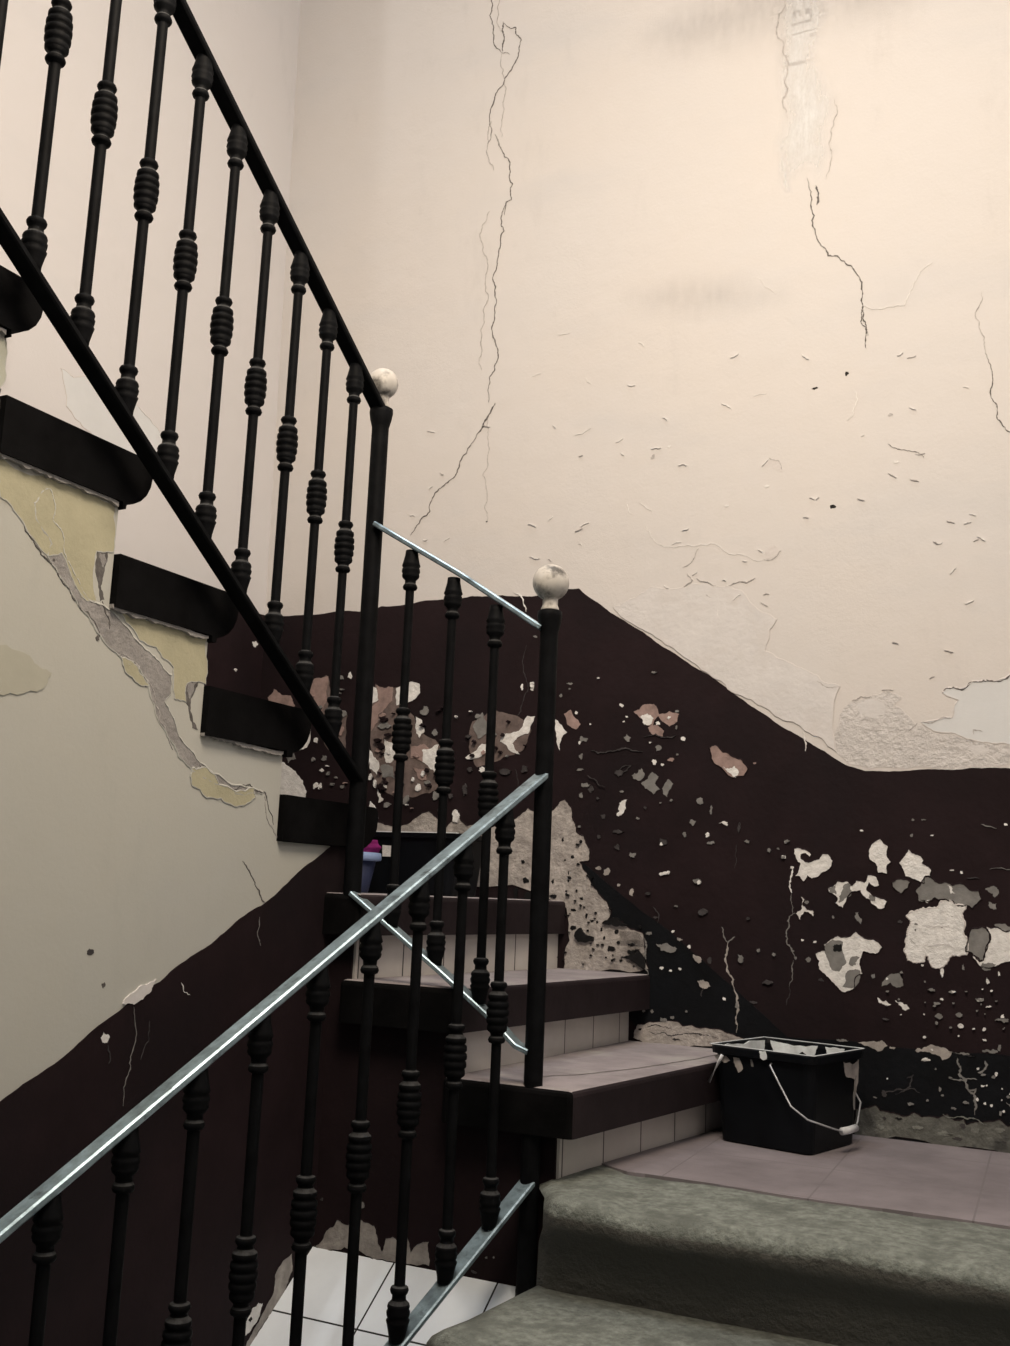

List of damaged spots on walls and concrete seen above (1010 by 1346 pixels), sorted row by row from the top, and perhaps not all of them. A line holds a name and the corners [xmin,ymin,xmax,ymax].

crack [776,0,789,118]
peeling [61,368,137,455]
peeling [133,404,162,452]
crack [411,0,521,534]
crack [807,99,932,348]
crack [975,293,1010,432]
peeling [0,459,264,808]
peeling [280,672,352,797]
peeling [368,682,535,899]
spalling [549,683,712,975]
peeling [613,503,1010,770]
peeling [767,819,1010,1153]